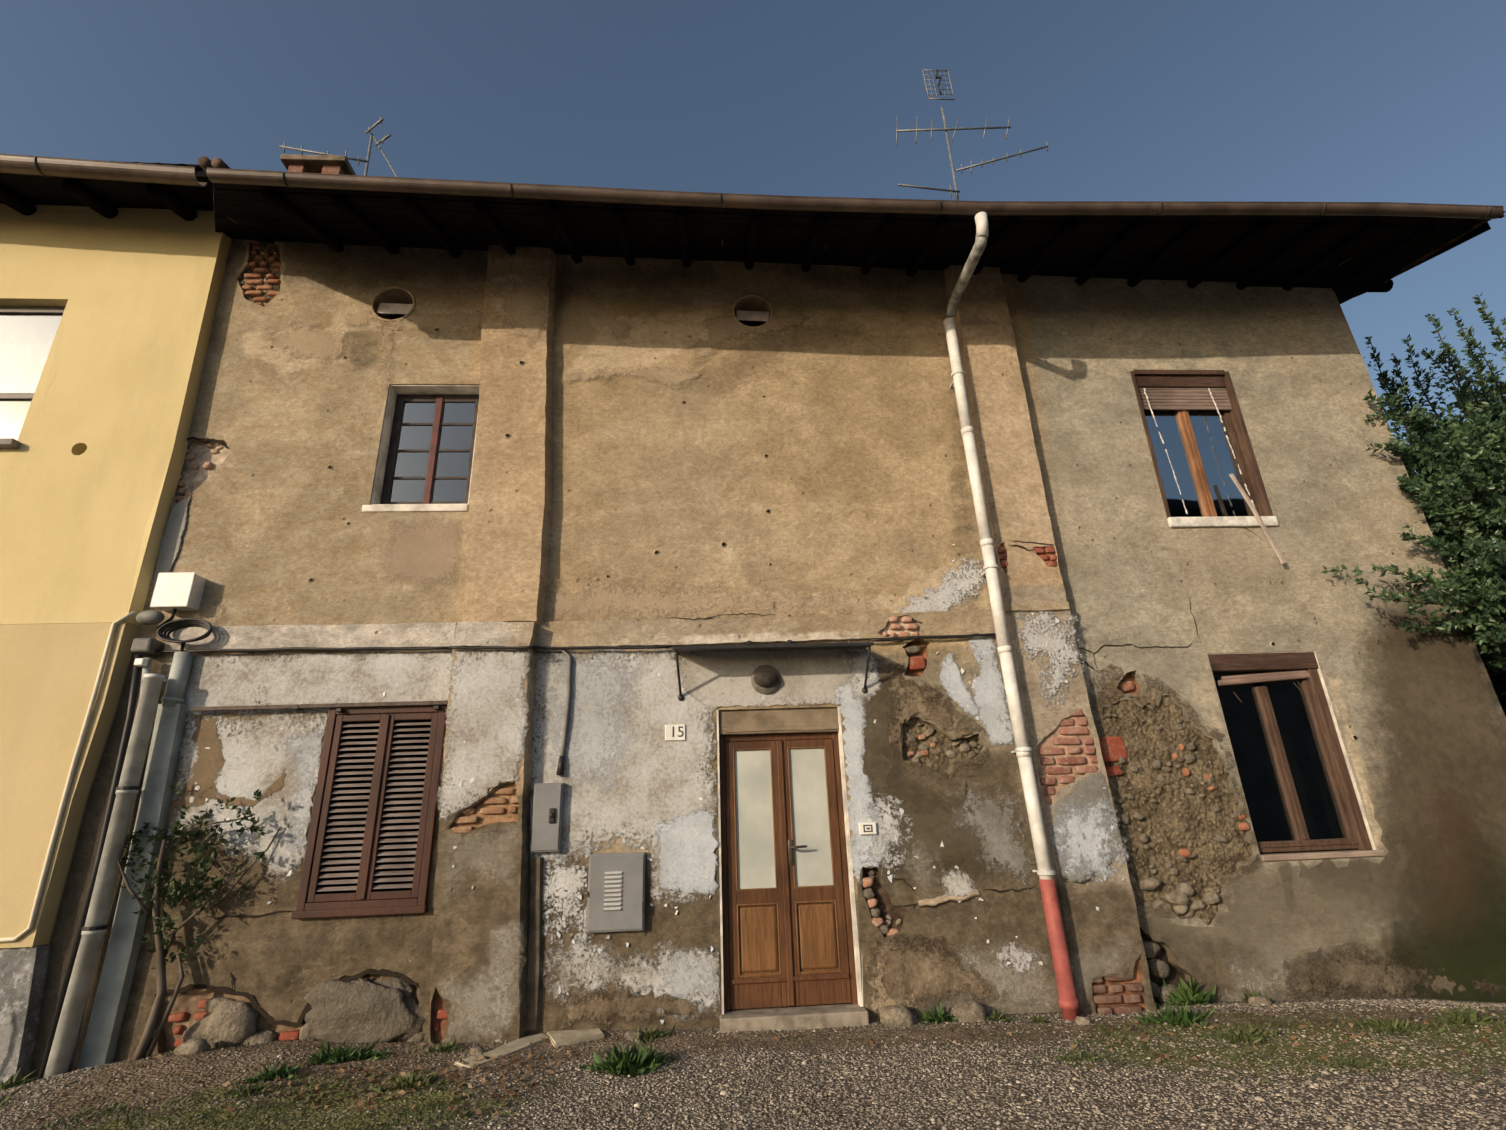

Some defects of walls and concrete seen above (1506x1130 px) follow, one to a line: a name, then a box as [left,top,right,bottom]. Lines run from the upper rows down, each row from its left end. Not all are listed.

spalling [239,240,281,306]
spalling [174,441,231,502]
spalling [983,543,1008,574]
spalling [1033,547,1059,567]
crack [1079,600,1202,673]
peeling [166,599,1262,1030]
water stain [1163,608,1506,1003]
peeling [0,1009,13,1070]
spalling [160,972,448,1052]